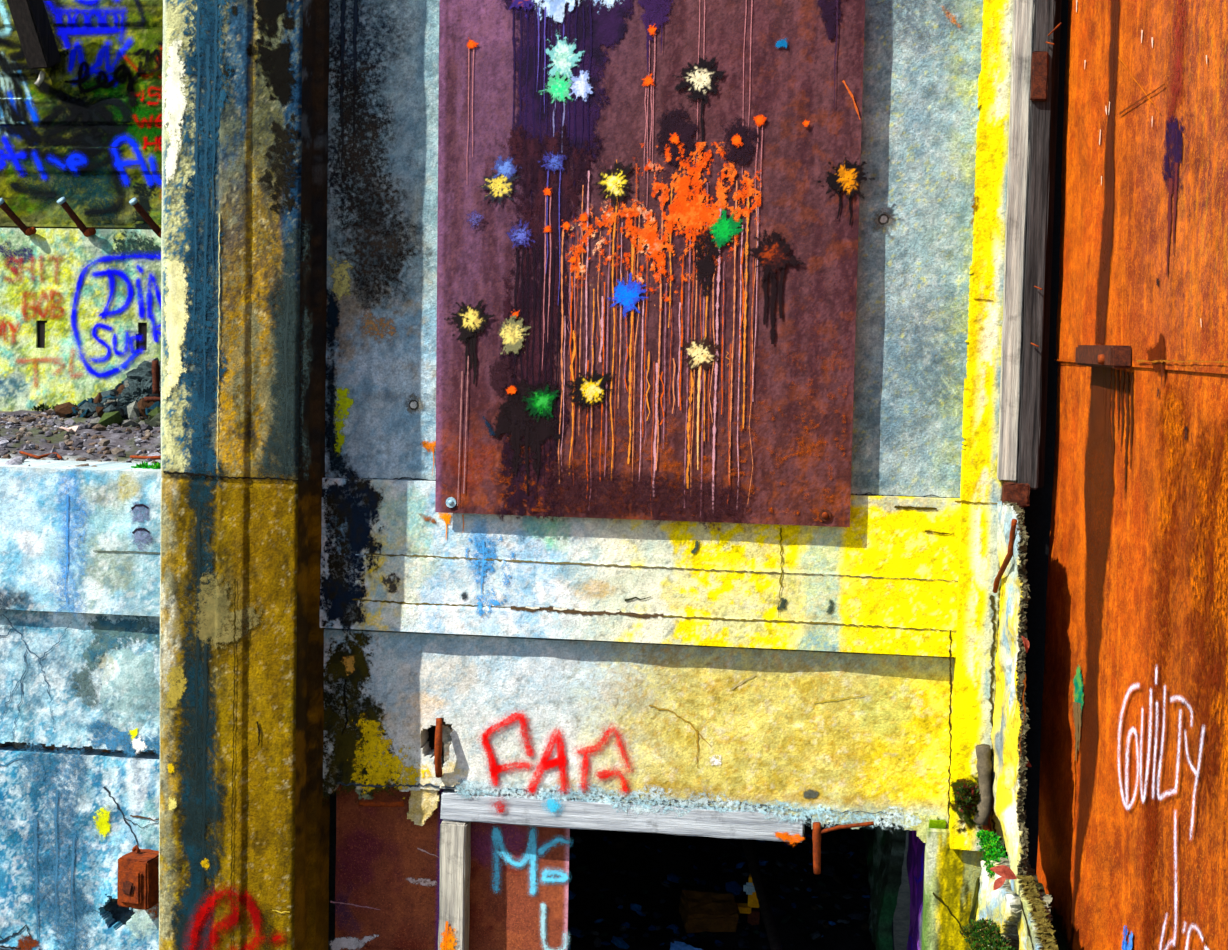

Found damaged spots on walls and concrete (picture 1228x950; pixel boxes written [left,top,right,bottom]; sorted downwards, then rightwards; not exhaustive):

rust [1162,0,1188,275]
leakage [18,0,237,950]
leakage [256,0,431,807]
rust [573,386,847,522]
crack [0,614,69,767]
rust [1142,333,1228,950]
spalling [104,898,135,925]
rust [335,785,570,950]